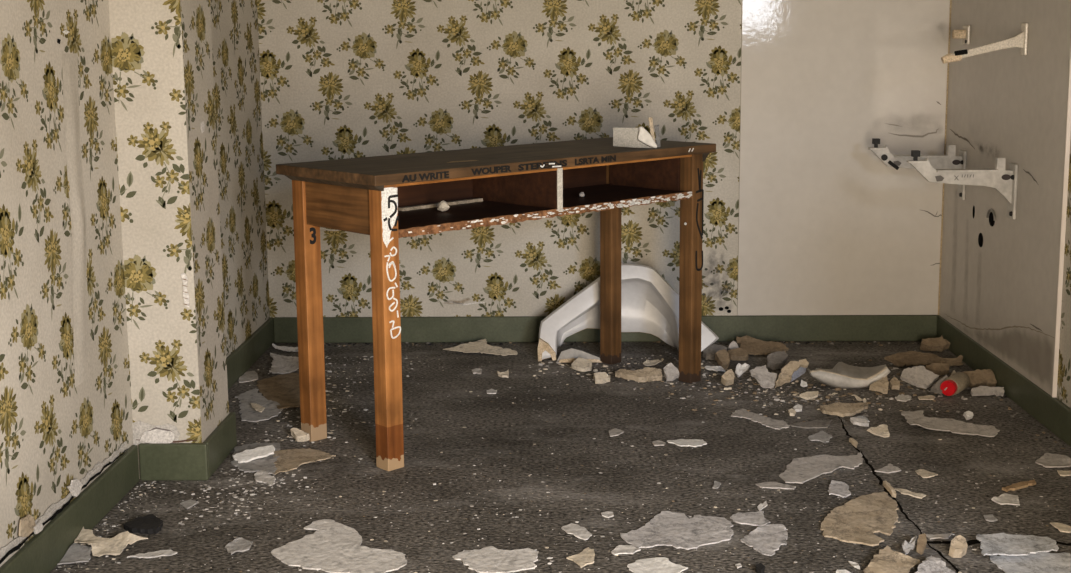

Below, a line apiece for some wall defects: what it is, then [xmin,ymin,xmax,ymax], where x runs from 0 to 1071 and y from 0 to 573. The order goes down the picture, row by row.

crack [838,416,981,573]